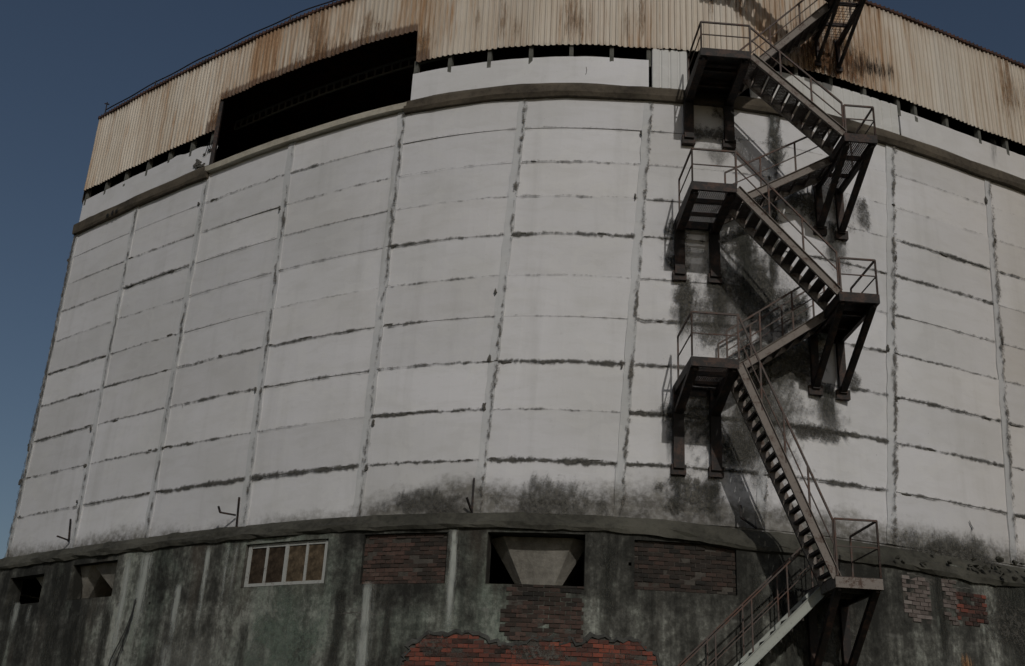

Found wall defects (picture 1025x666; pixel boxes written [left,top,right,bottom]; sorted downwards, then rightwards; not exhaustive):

damp [769,114,786,168]
damp [857,199,871,230]
damp [665,188,824,362]
spalling [985,183,1015,497]
damp [661,334,848,472]
peeling [886,233,989,627]
damp [519,475,609,515]
damp [655,474,724,517]
damp [95,554,151,666]
damp [171,586,181,630]
damp [200,549,210,608]
flaking render [397,584,662,666]